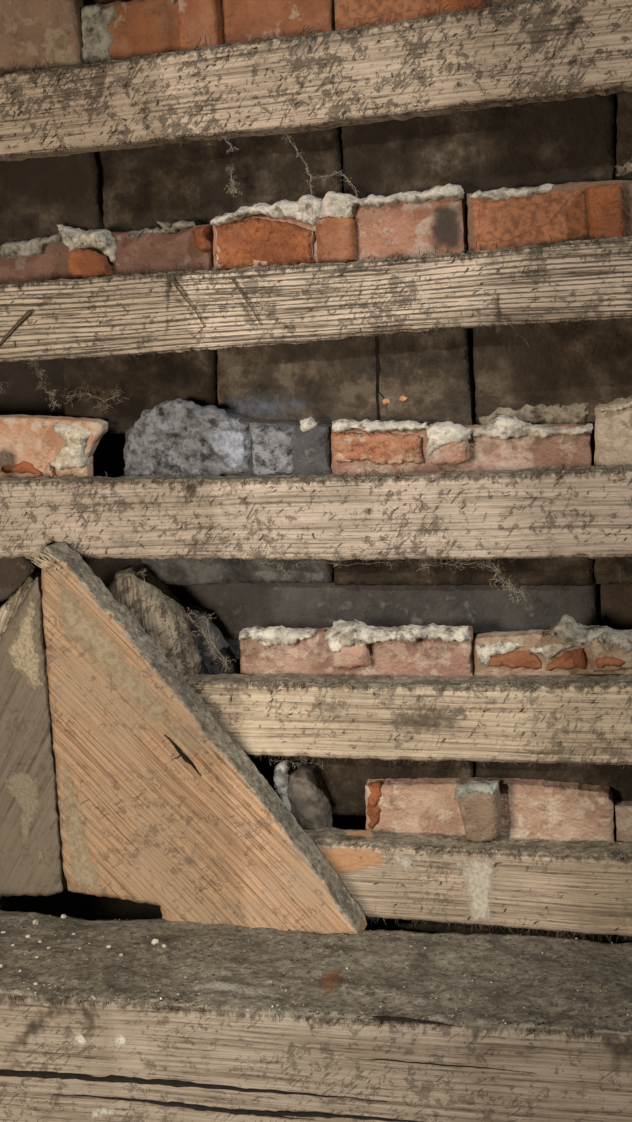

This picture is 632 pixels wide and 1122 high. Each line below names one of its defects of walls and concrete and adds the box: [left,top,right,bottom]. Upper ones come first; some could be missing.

crack [0,1069,417,1122]